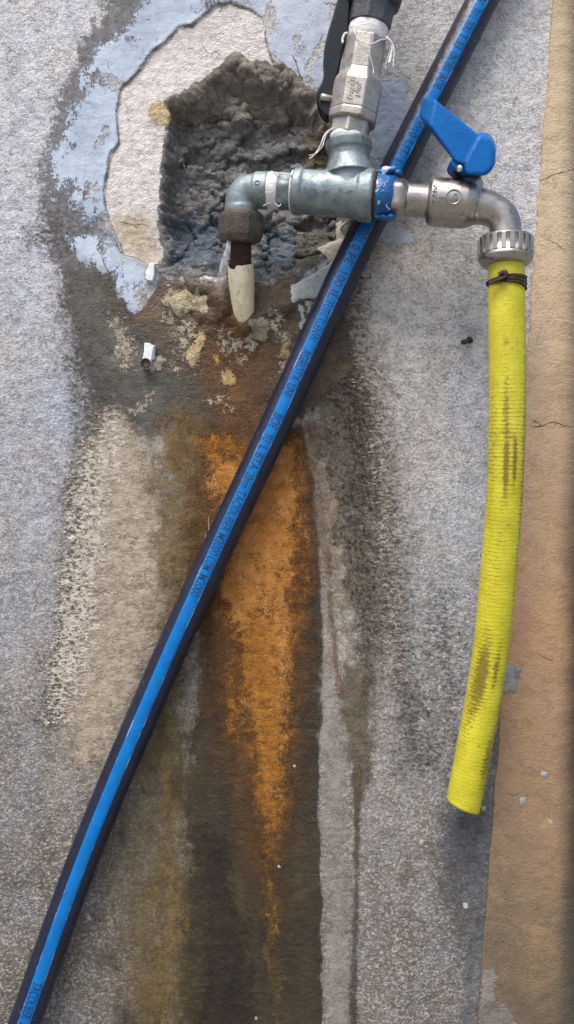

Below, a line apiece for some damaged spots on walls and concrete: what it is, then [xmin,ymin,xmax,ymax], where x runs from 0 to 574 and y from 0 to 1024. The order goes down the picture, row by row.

damp [15,0,315,777]
spalling [50,0,337,317]
rust [180,427,249,559]
rust [201,433,317,867]
spalling [249,209,352,359]